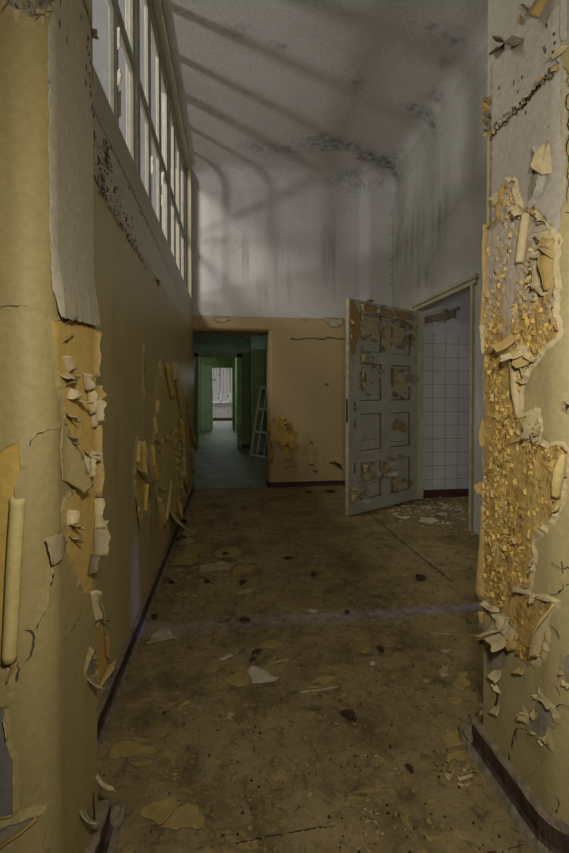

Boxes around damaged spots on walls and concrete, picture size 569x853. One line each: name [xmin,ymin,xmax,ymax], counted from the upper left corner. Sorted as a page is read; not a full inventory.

spalling [0,0,56,29]
peeling [94,131,161,286]
peeling [151,156,165,206]
spalling [321,299,460,390]
peeling [468,0,569,716]
peeling [133,354,190,538]
peeling [45,314,117,693]
peeling [440,730,475,787]
peeling [507,687,561,780]